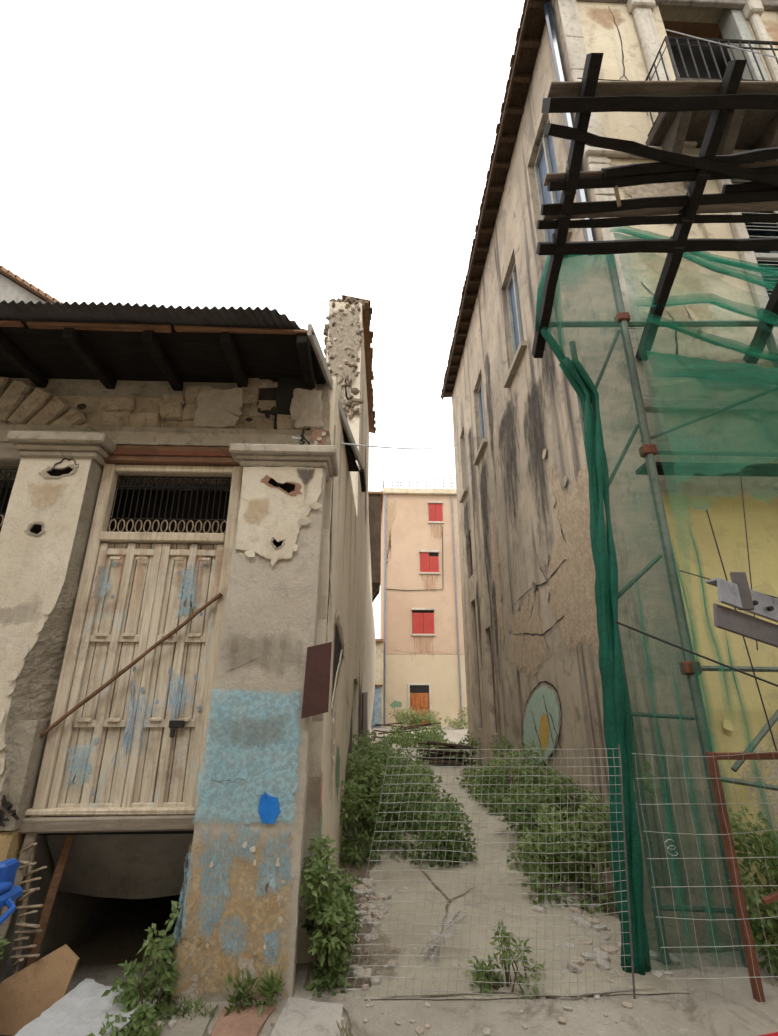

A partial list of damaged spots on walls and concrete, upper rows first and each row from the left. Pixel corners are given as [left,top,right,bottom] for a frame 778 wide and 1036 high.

crack [608,6,629,81]
hole [25,522,45,536]
hole [38,458,79,479]
peeling [235,466,323,567]
damp [464,298,556,681]
spalling [0,580,79,811]
crack [483,508,566,745]
peeling [172,825,292,1004]